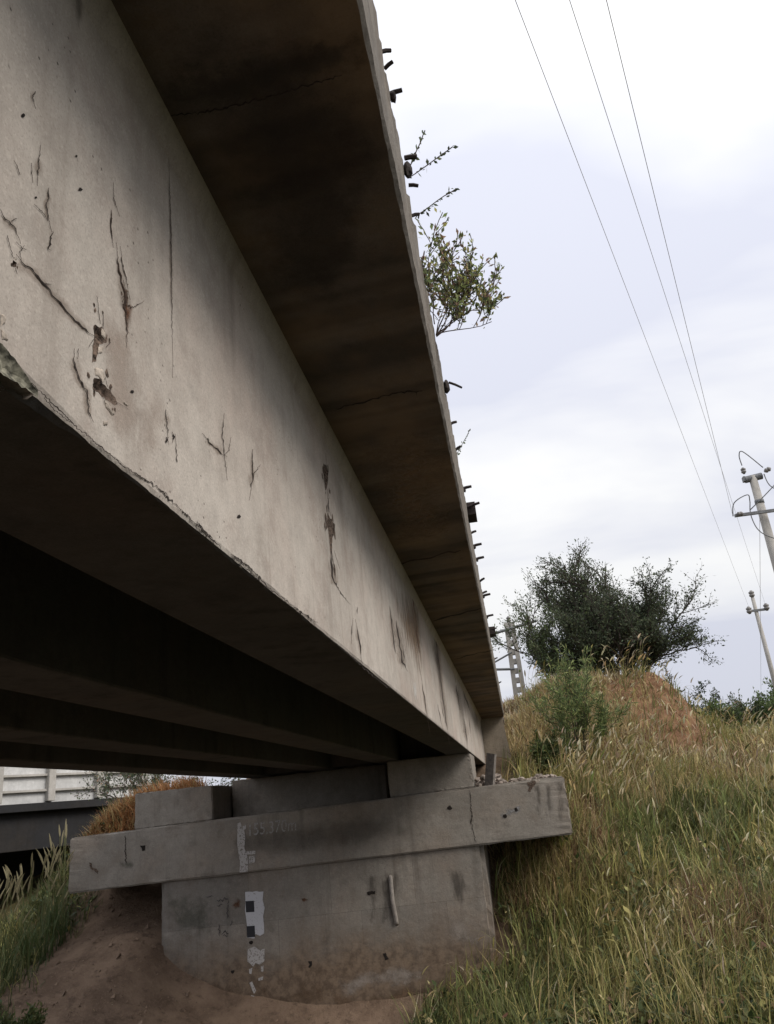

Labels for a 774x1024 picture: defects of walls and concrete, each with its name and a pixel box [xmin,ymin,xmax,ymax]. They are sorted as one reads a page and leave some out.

spalling [87,297,134,425]
crack [1,145,315,622]